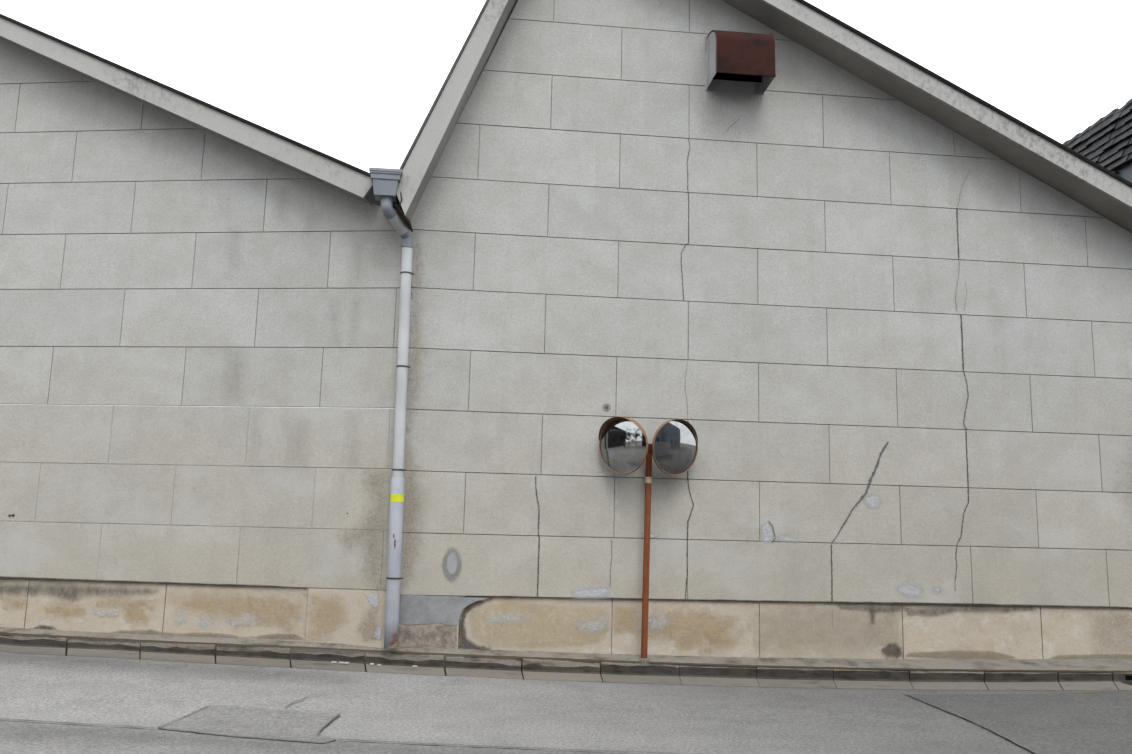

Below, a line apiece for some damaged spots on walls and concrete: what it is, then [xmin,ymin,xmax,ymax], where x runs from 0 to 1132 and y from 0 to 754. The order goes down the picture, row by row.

crack [681,139,690,422]
crack [955,170,970,590]
crack [684,471,694,600]
crack [831,442,889,629]
leakage [0,576,282,598]
leakage [115,612,253,638]
leakage [458,596,791,650]
leakage [883,643,1014,658]
leakage [817,601,1130,623]